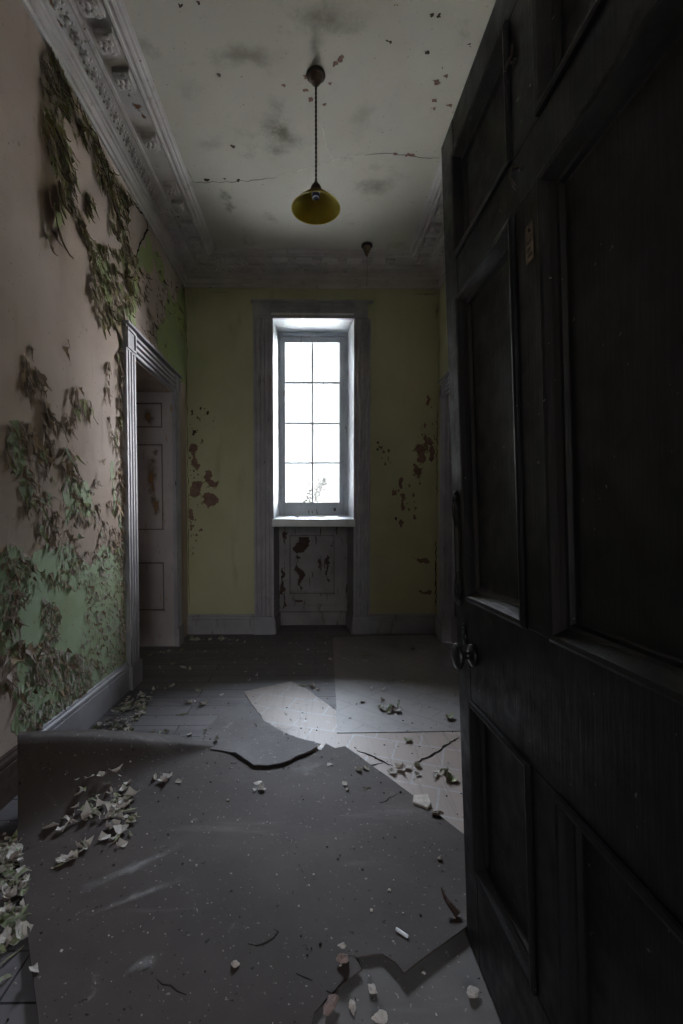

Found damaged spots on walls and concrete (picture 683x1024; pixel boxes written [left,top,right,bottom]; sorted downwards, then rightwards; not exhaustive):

peeling [0,42,186,735]
peeling [187,407,220,555]
peeling [389,422,435,528]
peeling [279,532,310,609]